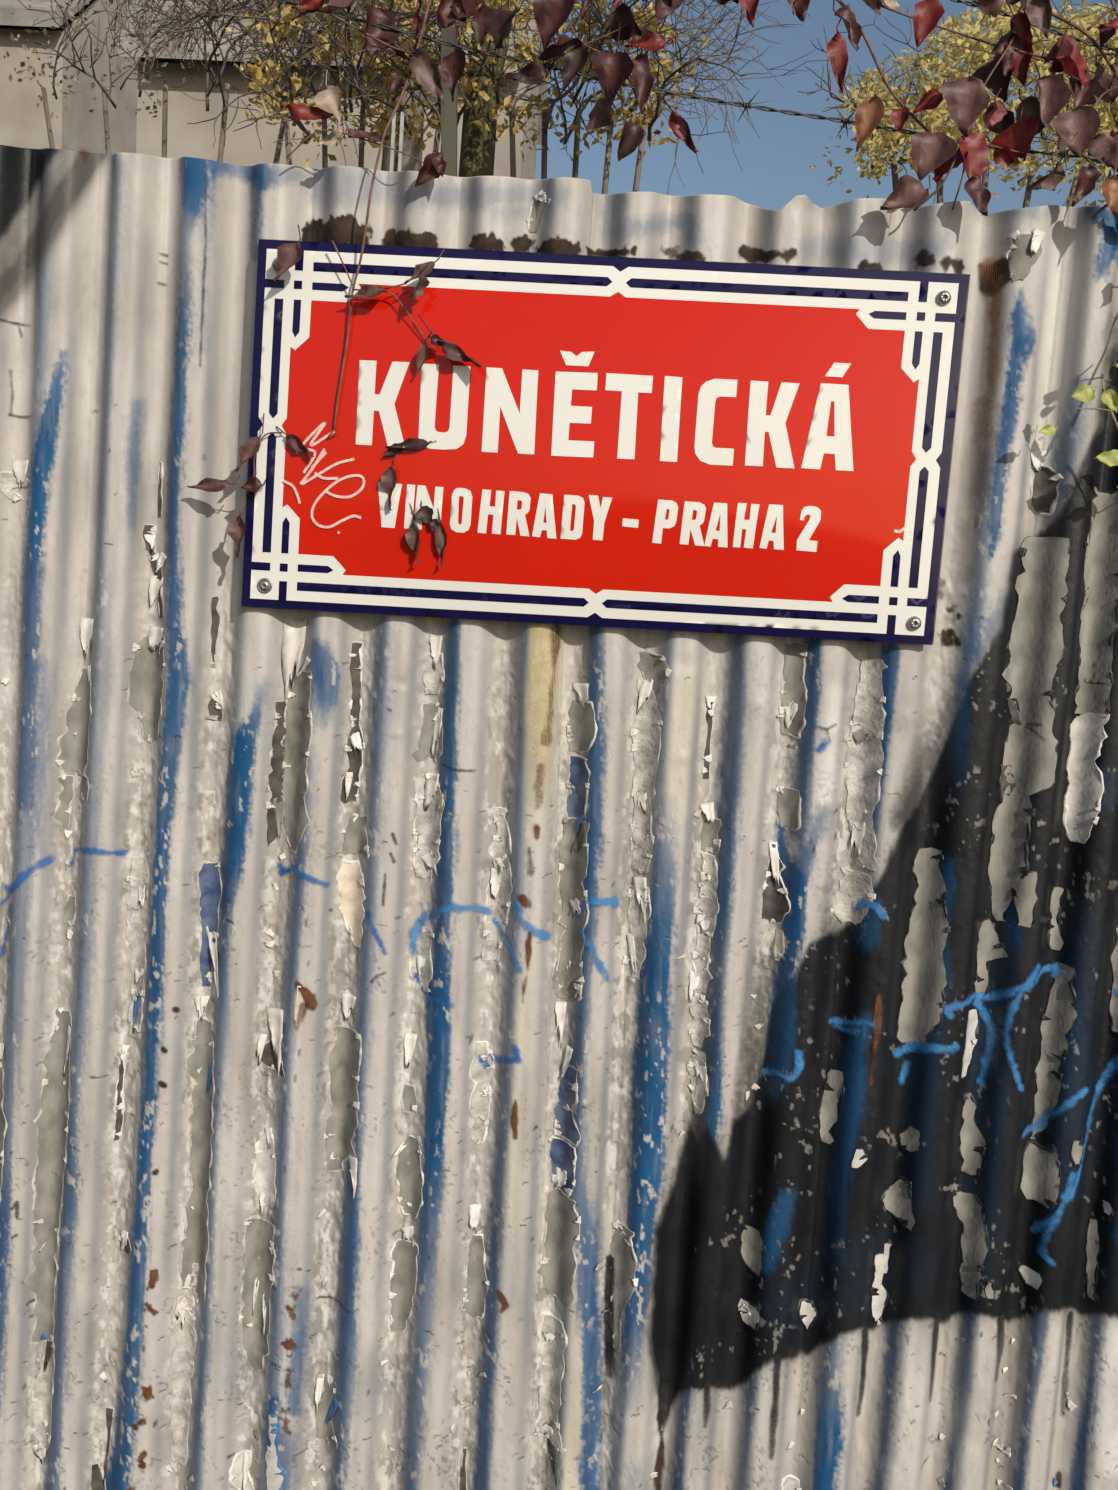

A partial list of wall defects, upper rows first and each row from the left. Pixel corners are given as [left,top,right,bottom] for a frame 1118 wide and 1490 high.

rust [665,247,706,261]
peeling [265,618,313,860]
peeling [336,642,370,948]
peeling [830,656,888,925]
peeling [896,847,951,1044]
peeling [951,485,1118,1302]
peeling [24,1007,72,1464]
peeling [164,861,222,1482]
peeling [238,1127,277,1371]
peeling [324,993,362,1199]
peeling [387,1135,425,1332]
peeling [533,683,638,1490]